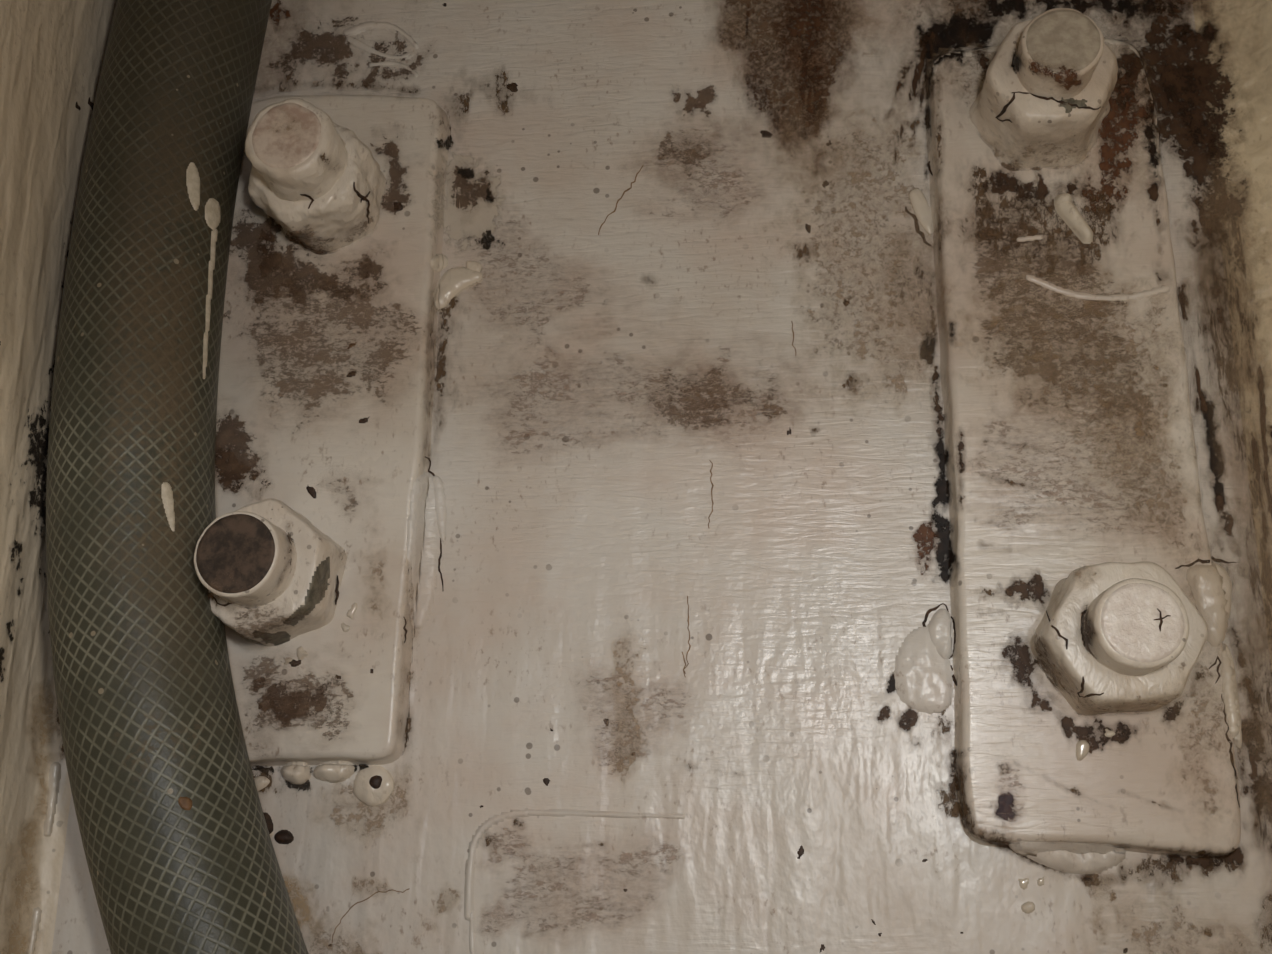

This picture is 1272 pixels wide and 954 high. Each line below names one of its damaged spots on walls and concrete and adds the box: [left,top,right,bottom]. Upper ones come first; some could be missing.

corrosion [795,224,811,259]
corrosion [894,0,1272,851]
corrosion [877,674,919,746]
corrosion [938,750,1060,873]
corrosion [1081,847,1244,901]